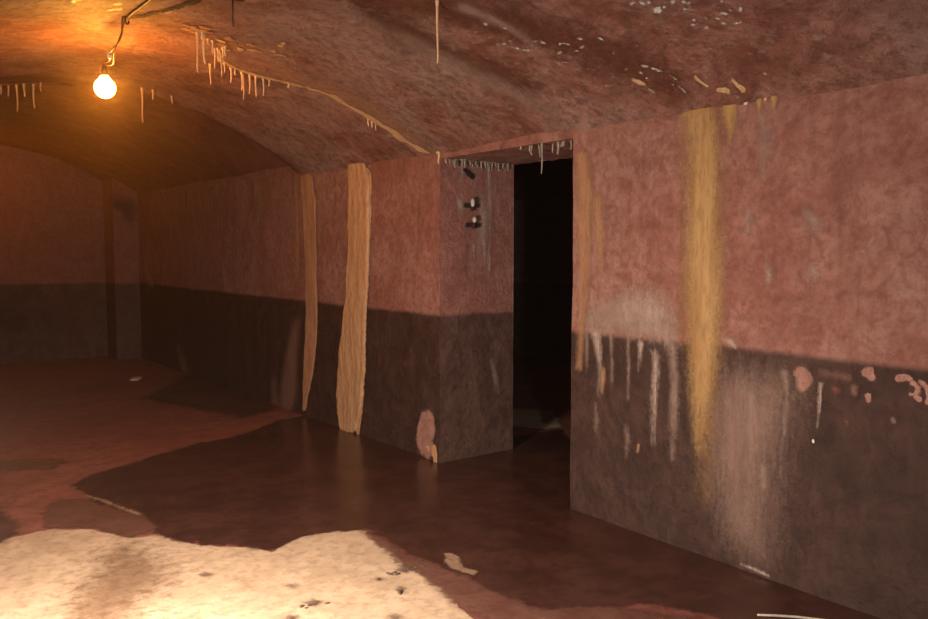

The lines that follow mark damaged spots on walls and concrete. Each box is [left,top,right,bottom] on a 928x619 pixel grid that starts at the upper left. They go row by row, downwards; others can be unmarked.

efflorescence [0,82,66,111]
efflorescence [180,24,510,272]
leakage [43,96,881,619]
peeling [793,366,837,413]
peeling [861,367,876,381]
peeling [895,374,928,405]